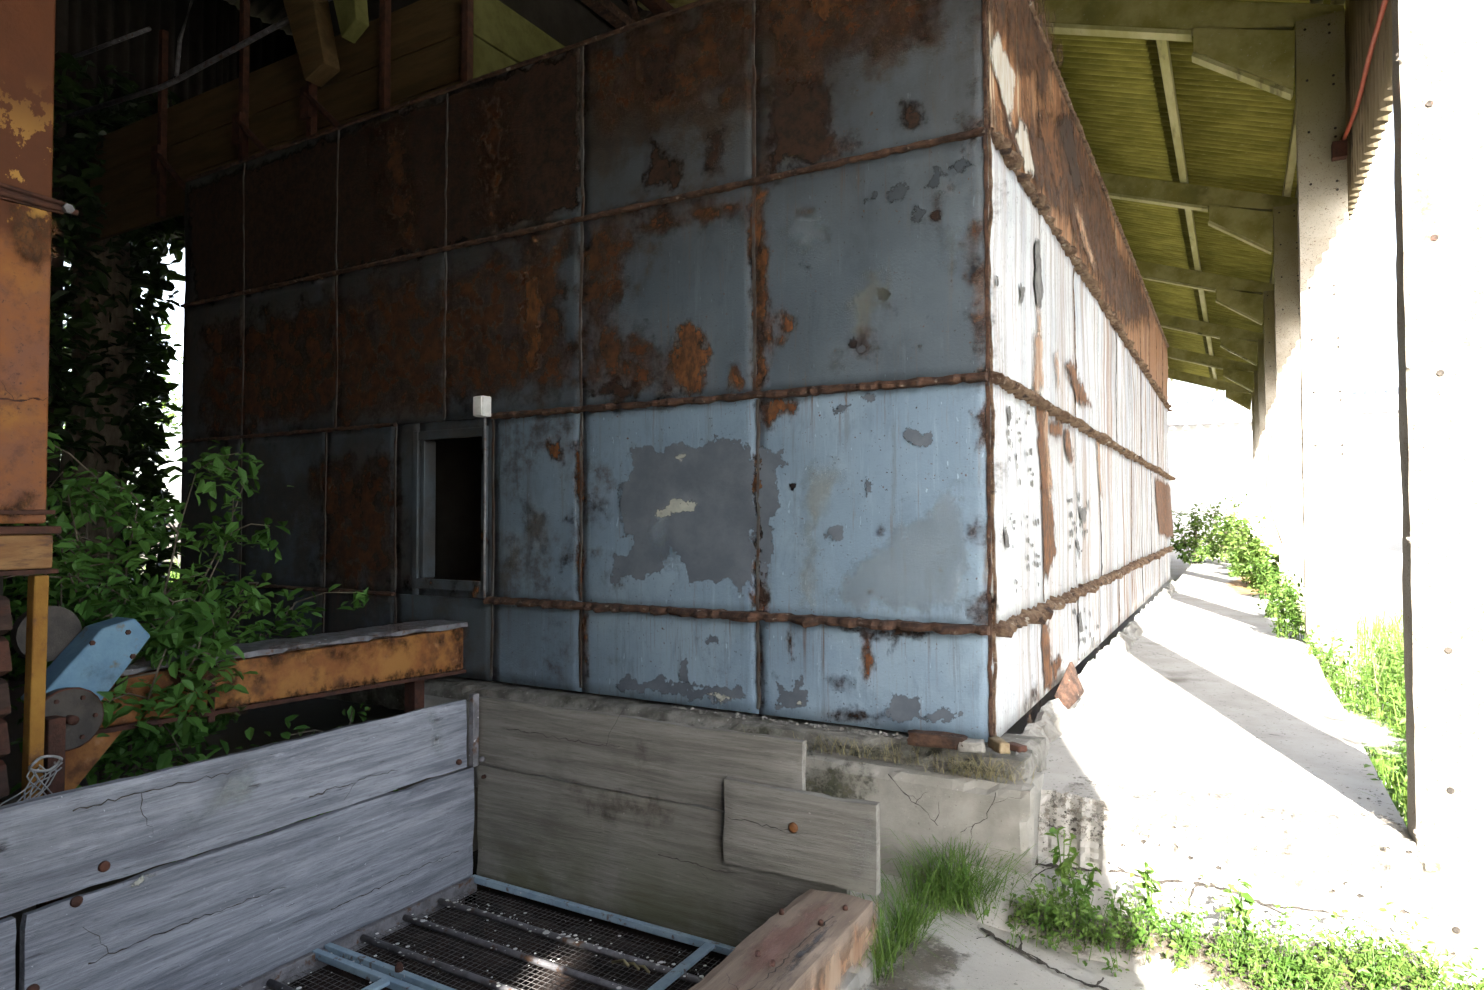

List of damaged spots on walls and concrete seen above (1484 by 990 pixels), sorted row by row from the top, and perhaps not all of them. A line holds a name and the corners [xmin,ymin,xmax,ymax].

rust [899,101,924,130]
rust [965,0,1154,330]
rust [11,208,58,269]
rust [977,404,991,444]
rust [1033,334,1092,583]
rust [545,438,603,591]
peeling [610,435,796,596]
rust [968,593,998,625]
rust [277,629,465,700]
peeling [886,693,963,723]
crack [888,774,1012,844]